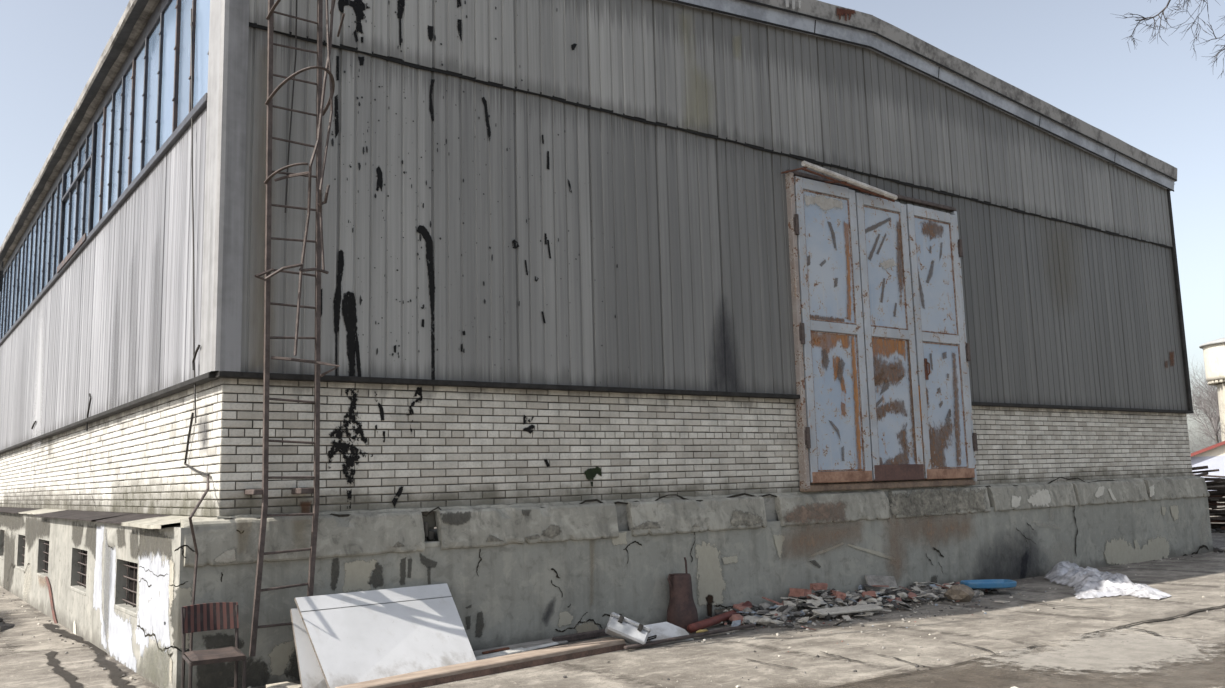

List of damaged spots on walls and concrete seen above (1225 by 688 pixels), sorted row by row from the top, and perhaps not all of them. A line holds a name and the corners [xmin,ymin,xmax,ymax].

rust [836,7,856,21]
rust [922,221,943,240]
rust [810,222,861,471]
rust [872,336,961,473]
damp [3,516,50,591]
damp [139,529,172,561]
peeling [612,521,660,546]
spalling [773,502,845,559]
peeling [1104,535,1170,565]
peeling [72,522,192,684]
crack [137,625,190,657]